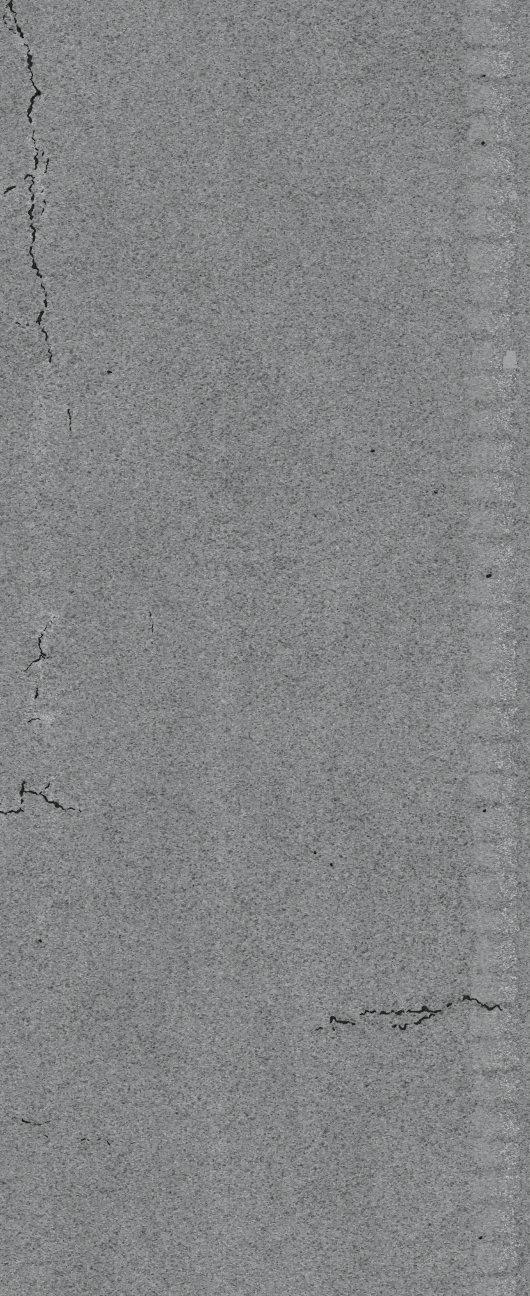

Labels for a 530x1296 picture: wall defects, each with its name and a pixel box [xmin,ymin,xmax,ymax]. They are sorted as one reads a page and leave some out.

crack [3,0,52,363]
crack [0,781,81,814]
crack [316,995,502,1030]